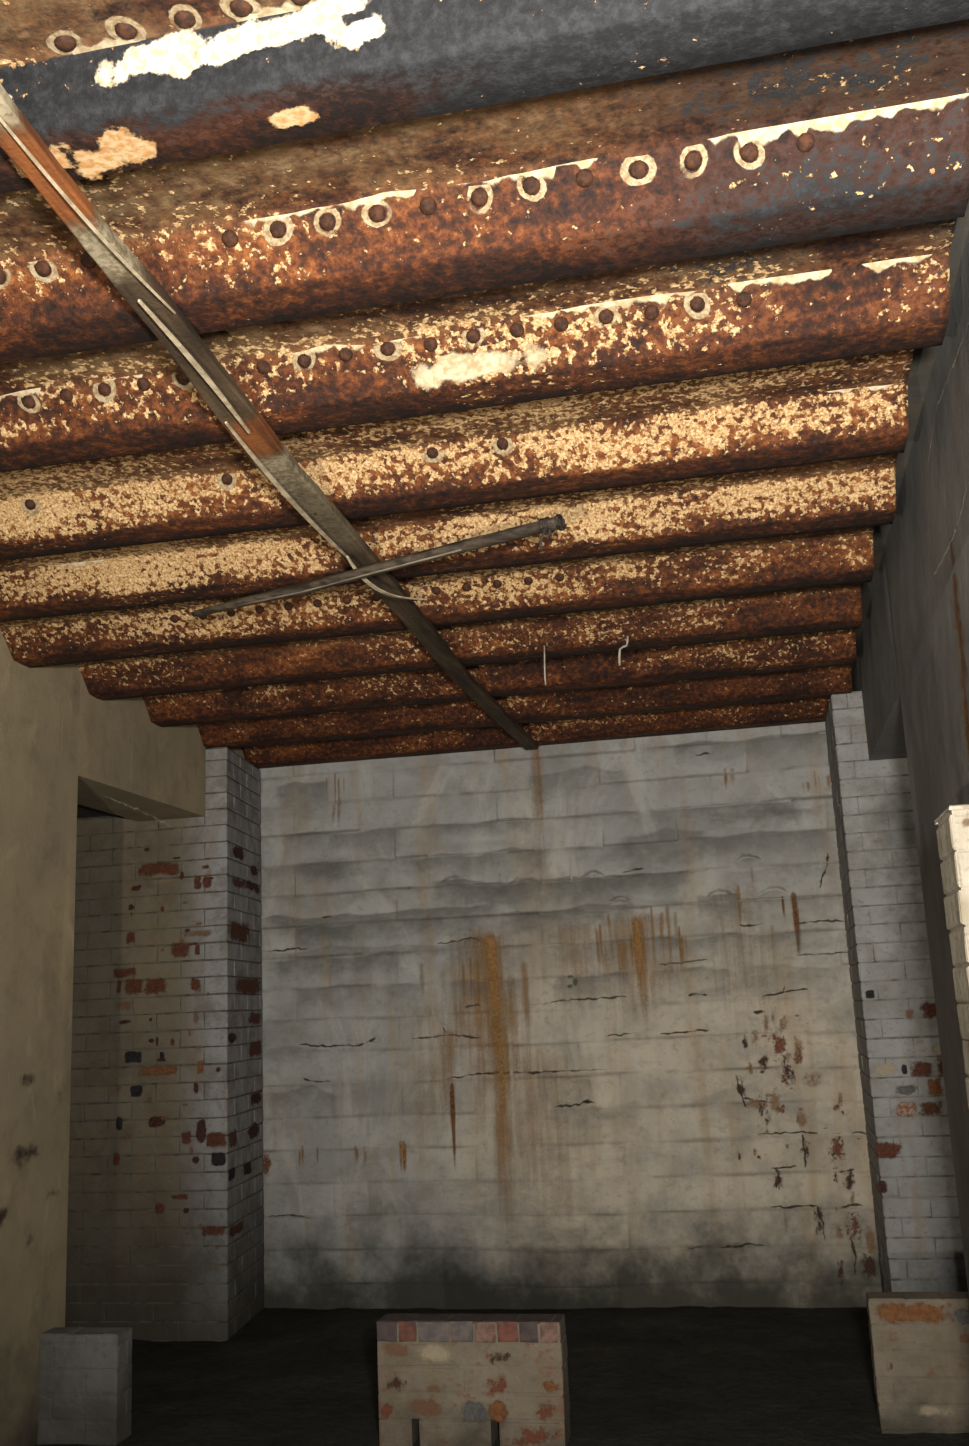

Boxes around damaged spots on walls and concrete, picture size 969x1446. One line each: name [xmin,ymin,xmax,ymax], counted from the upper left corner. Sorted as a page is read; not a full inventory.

peeling [95,0,385,87]
peeling [49,127,156,180]
peeling [268,106,319,129]
peeling [412,343,548,389]
corrosion [950,539,966,672]
corrosion [620,909,683,984]
crack [763,854,848,997]
crack [299,1037,377,1082]
crack [413,1004,480,1039]
corrosion [463,936,508,1158]
crack [446,1069,600,1108]
peeling [181,1093,271,1181]